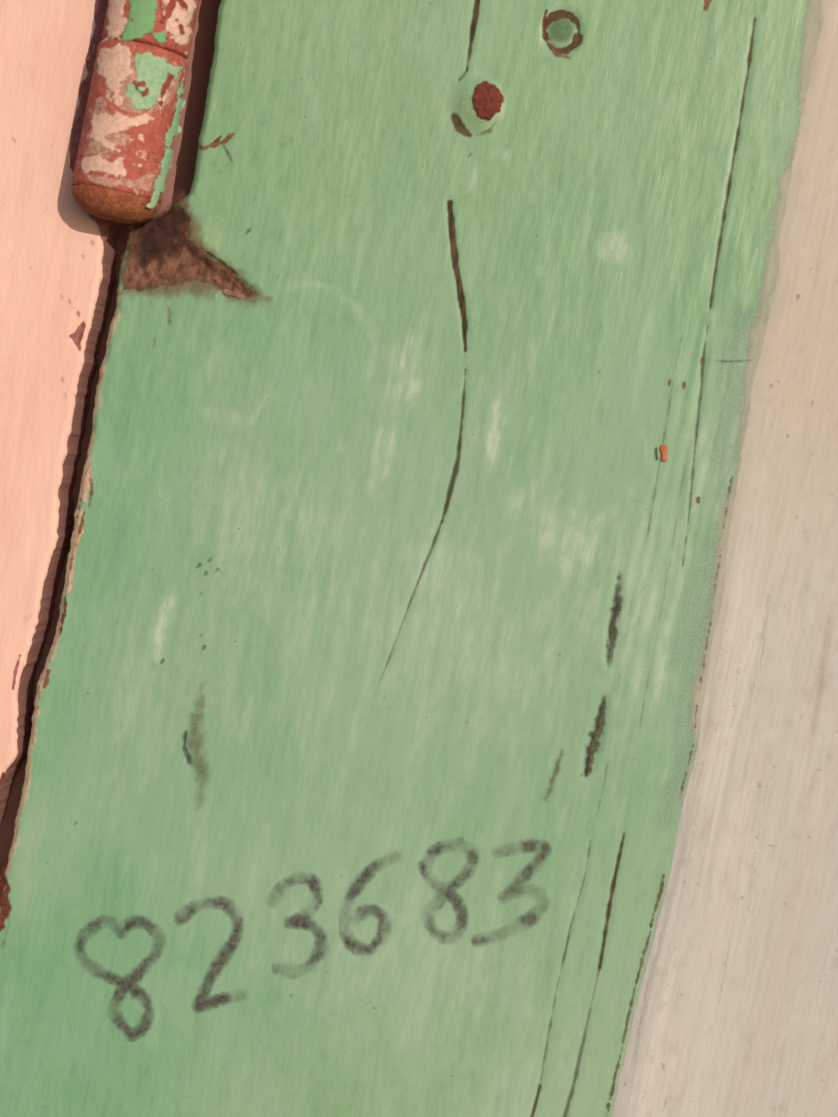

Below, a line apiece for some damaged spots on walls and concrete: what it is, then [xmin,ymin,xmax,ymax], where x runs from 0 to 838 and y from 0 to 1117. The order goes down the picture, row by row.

crack [466,0,480,71]
rust [543,9,570,58]
crack [710,18,756,308]
crack [447,200,468,352]
crack [410,391,465,601]
crack [690,347,705,506]
crack [598,835,624,970]
crack [607,874,665,1108]
crack [531,1085,541,1117]